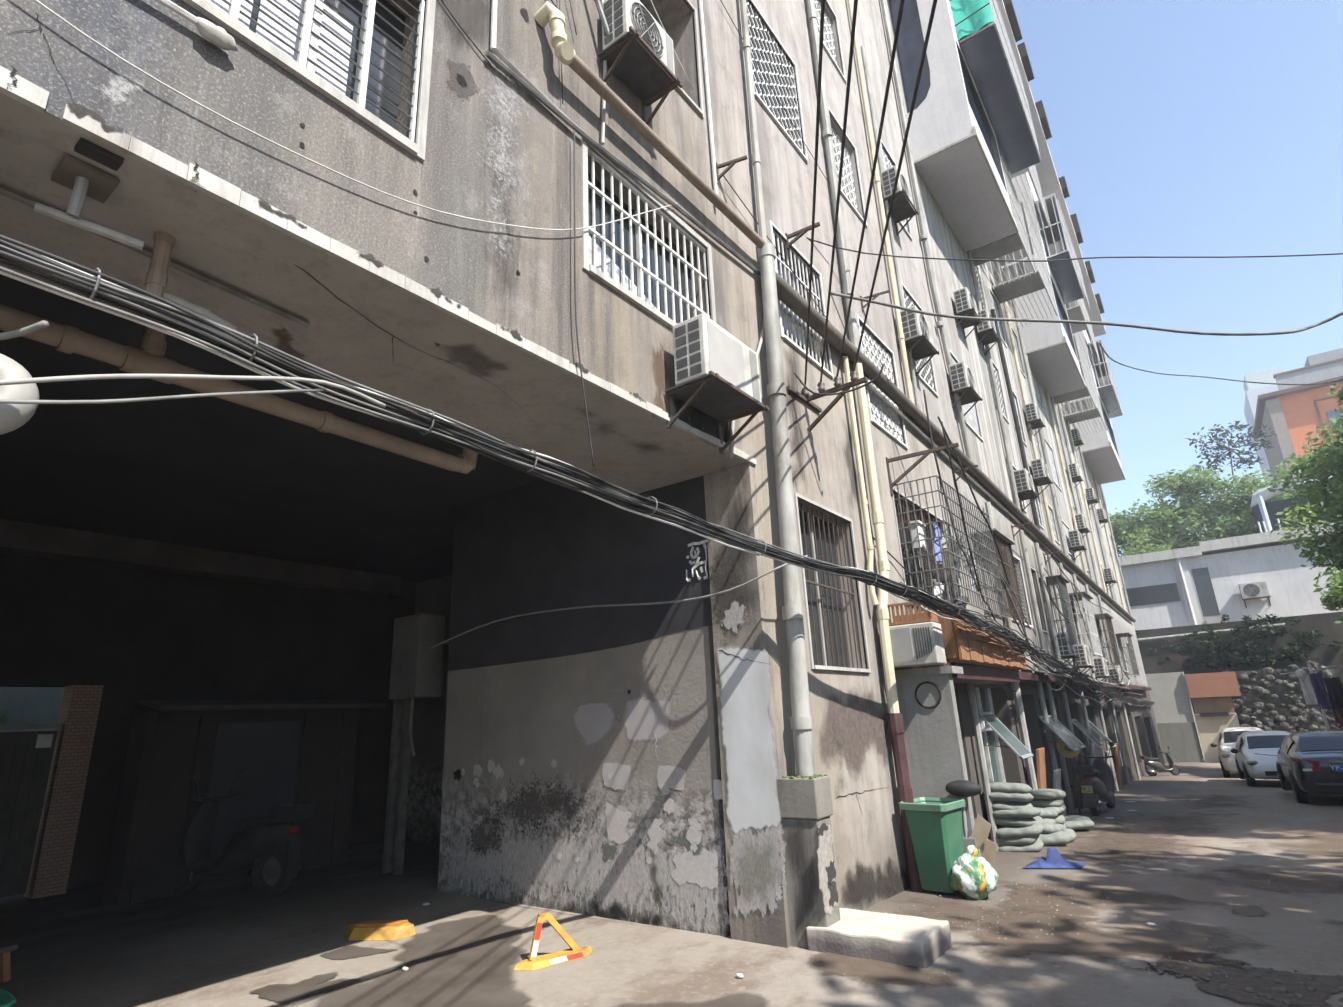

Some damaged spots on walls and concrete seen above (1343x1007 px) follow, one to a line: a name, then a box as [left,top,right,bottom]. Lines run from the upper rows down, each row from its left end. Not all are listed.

damp [821,693,891,772]
damp [466,773,618,860]
peeling [438,759,787,936]
damp [569,902,661,925]
damp [652,853,663,897]
damp [670,833,703,855]